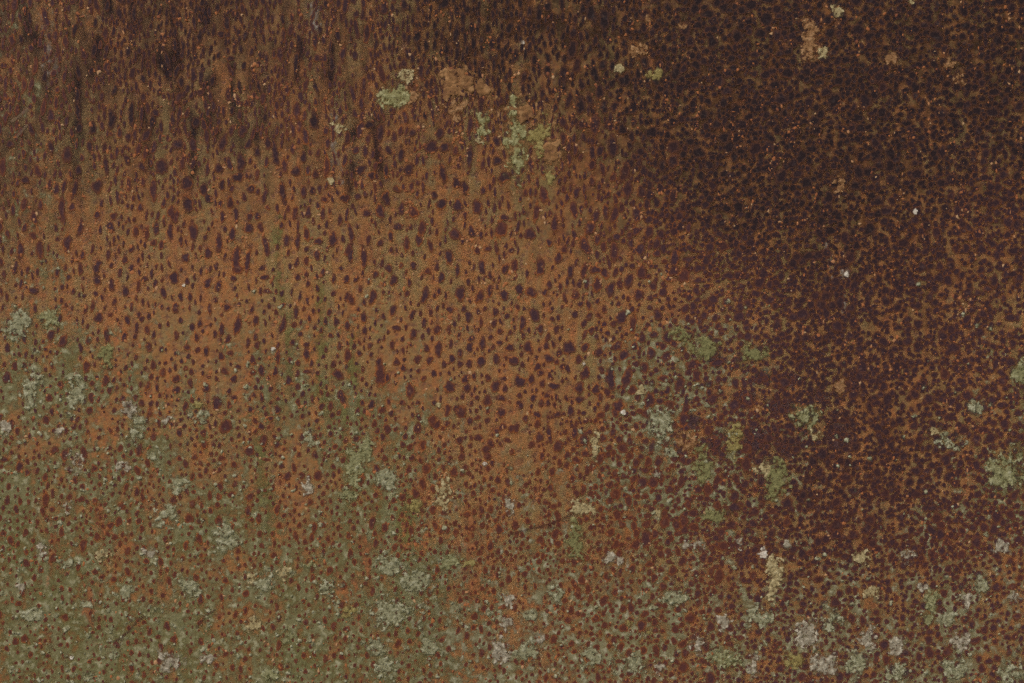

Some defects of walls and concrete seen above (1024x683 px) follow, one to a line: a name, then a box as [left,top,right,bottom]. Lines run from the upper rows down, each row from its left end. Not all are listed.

corrosion [0,0,168,253]
corrosion [167,30,279,284]
corrosion [279,27,340,205]
corrosion [344,222,367,269]
corrosion [339,120,426,247]
corrosion [409,128,483,340]
corrosion [438,63,565,183]
corrosion [207,303,259,337]
corrosion [344,289,377,331]
corrosion [374,356,390,388]
corrosion [443,260,603,460]
corrosion [573,289,656,417]